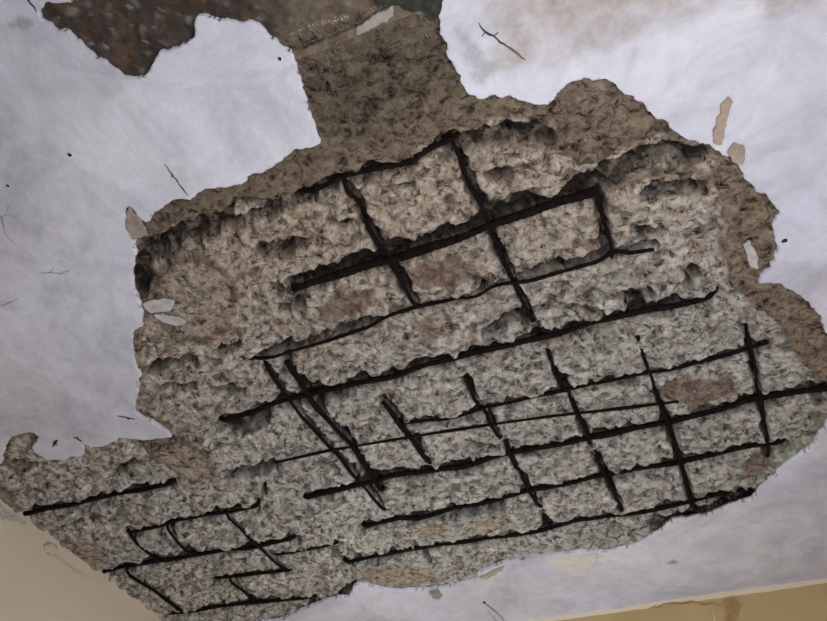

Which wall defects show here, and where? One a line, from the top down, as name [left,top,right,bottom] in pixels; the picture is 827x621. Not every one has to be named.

flaking render [41,0,443,76]
crack [479,23,526,60]
crack [0,209,17,246]
spalling [298,131,490,256]
spalling [291,178,610,293]
spalling [249,248,655,360]
spalling [456,371,657,418]
spalling [651,346,766,458]
spalling [681,385,827,513]
spalling [743,323,770,457]
spalling [360,488,528,528]
spalling [343,499,690,564]